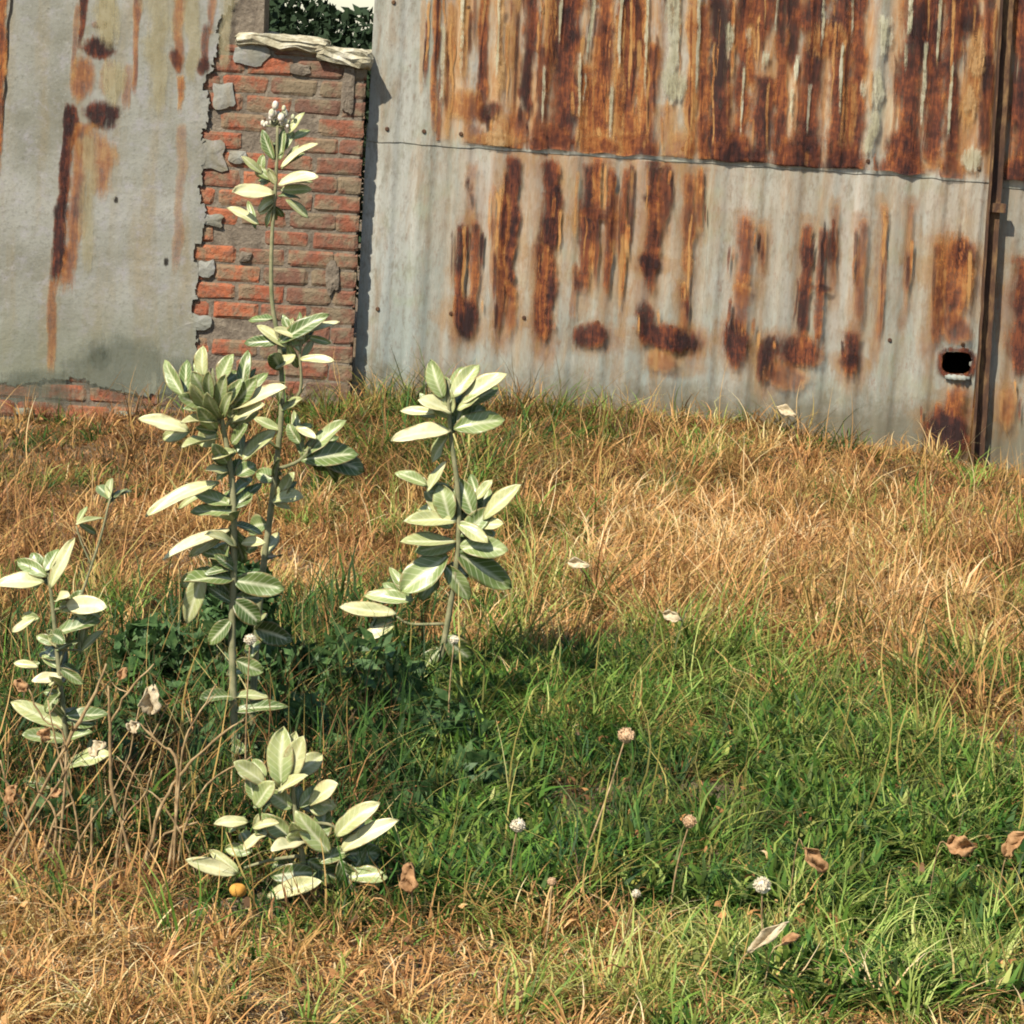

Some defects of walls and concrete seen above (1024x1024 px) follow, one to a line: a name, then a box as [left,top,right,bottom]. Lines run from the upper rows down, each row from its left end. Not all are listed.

corrosion [51,0,119,283]
spalling [0,377,191,418]
spalling [185,44,367,410]
corrosion [423,0,998,352]
corrosion [723,216,836,388]
corrosion [839,331,860,376]
corrosion [920,232,976,455]
corrosion [1000,256,1024,429]